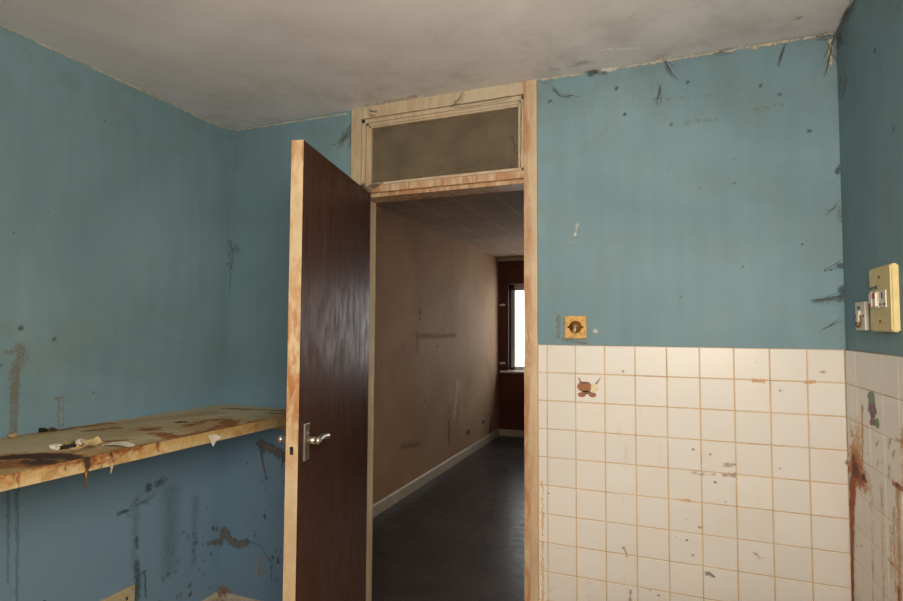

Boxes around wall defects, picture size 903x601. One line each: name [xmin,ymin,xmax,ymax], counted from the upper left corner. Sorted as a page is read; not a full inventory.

peeling [540,32,834,81]
leakage [0,344,27,433]
rust [847,426,869,601]